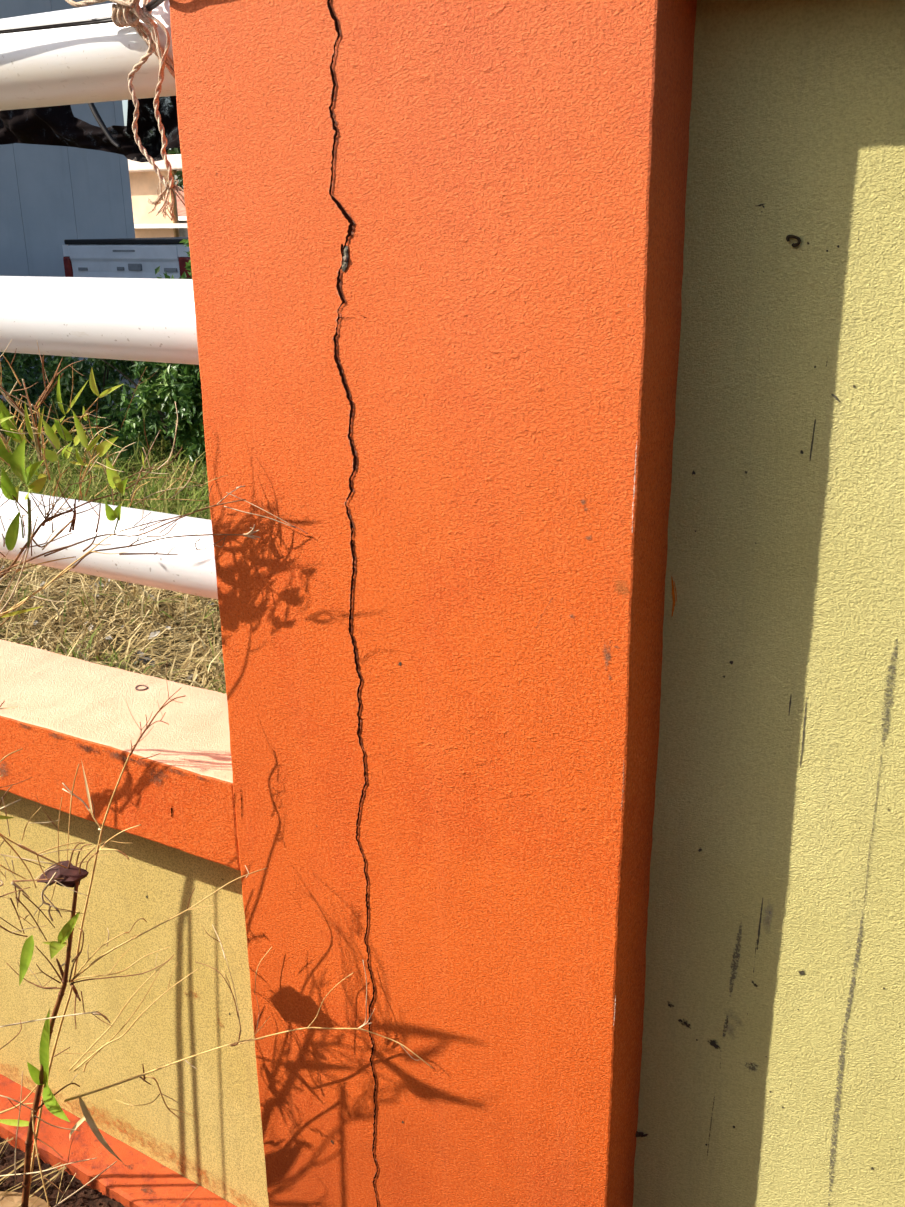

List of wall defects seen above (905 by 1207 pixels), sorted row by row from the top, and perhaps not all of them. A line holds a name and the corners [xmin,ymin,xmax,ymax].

crack [327,0,378,1207]